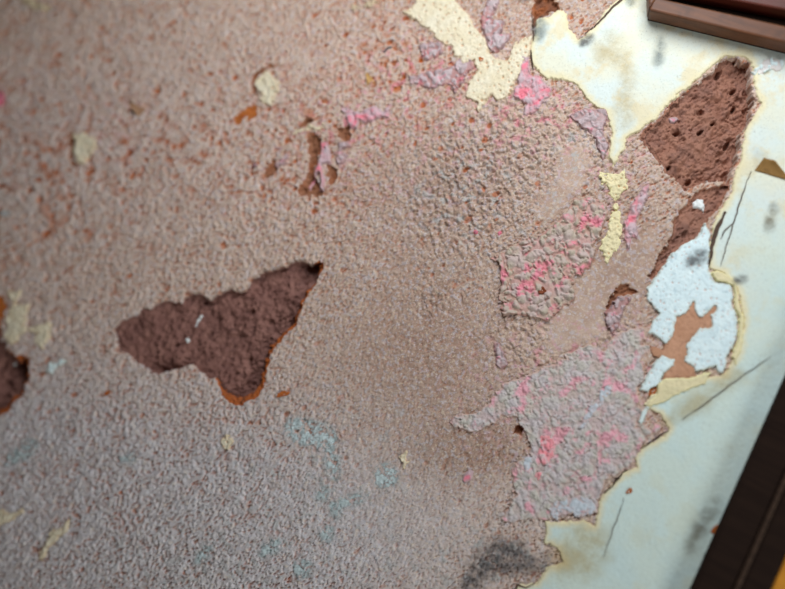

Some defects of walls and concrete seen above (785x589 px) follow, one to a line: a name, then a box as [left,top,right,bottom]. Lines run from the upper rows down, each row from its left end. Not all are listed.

flaking render [292,117,338,198]
peeling [403,0,785,589]